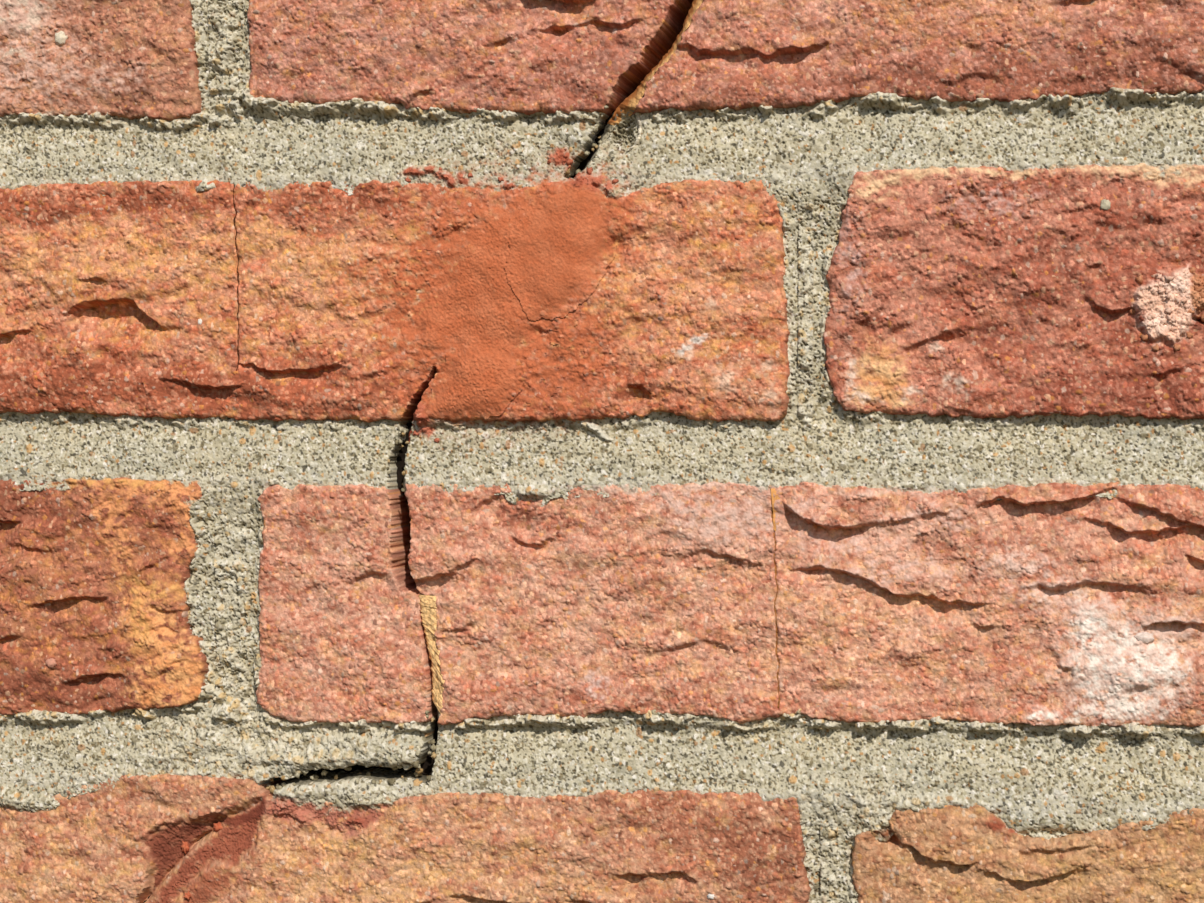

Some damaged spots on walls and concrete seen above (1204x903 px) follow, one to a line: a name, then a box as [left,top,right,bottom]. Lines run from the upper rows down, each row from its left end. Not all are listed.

crack [565,0,703,179]
crack [232,184,240,371]
crack [387,419,414,498]
crack [265,582,445,794]